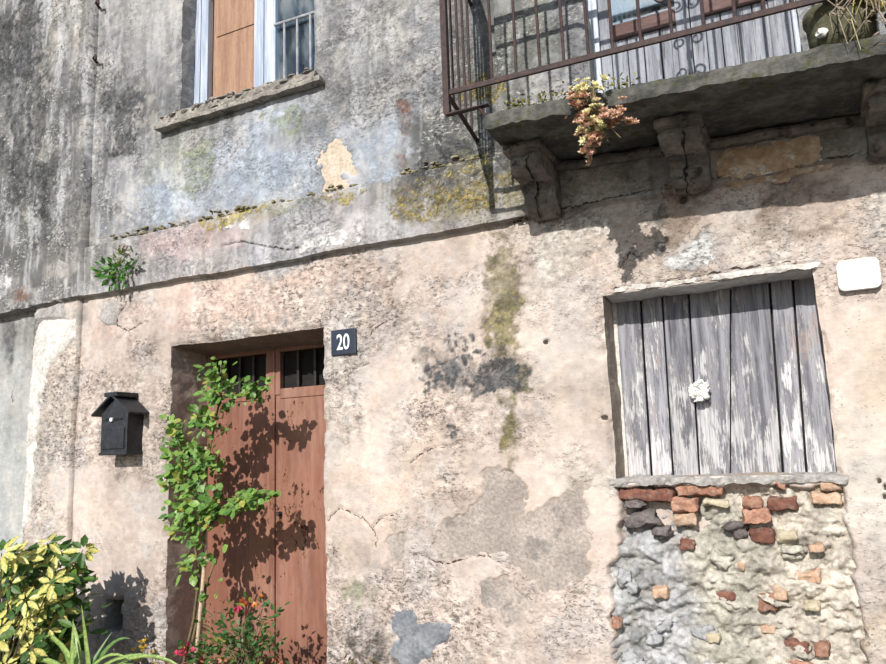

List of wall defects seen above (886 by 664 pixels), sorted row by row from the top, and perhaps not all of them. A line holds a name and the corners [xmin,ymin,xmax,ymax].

damp [0,0,55,222]
damp [99,83,145,157]
spalling [316,138,357,197]
damp [411,134,509,187]
spalling [714,135,835,188]
mould [422,333,531,398]
crack [329,508,401,544]
spalling [431,466,593,592]
spalling [479,575,532,628]